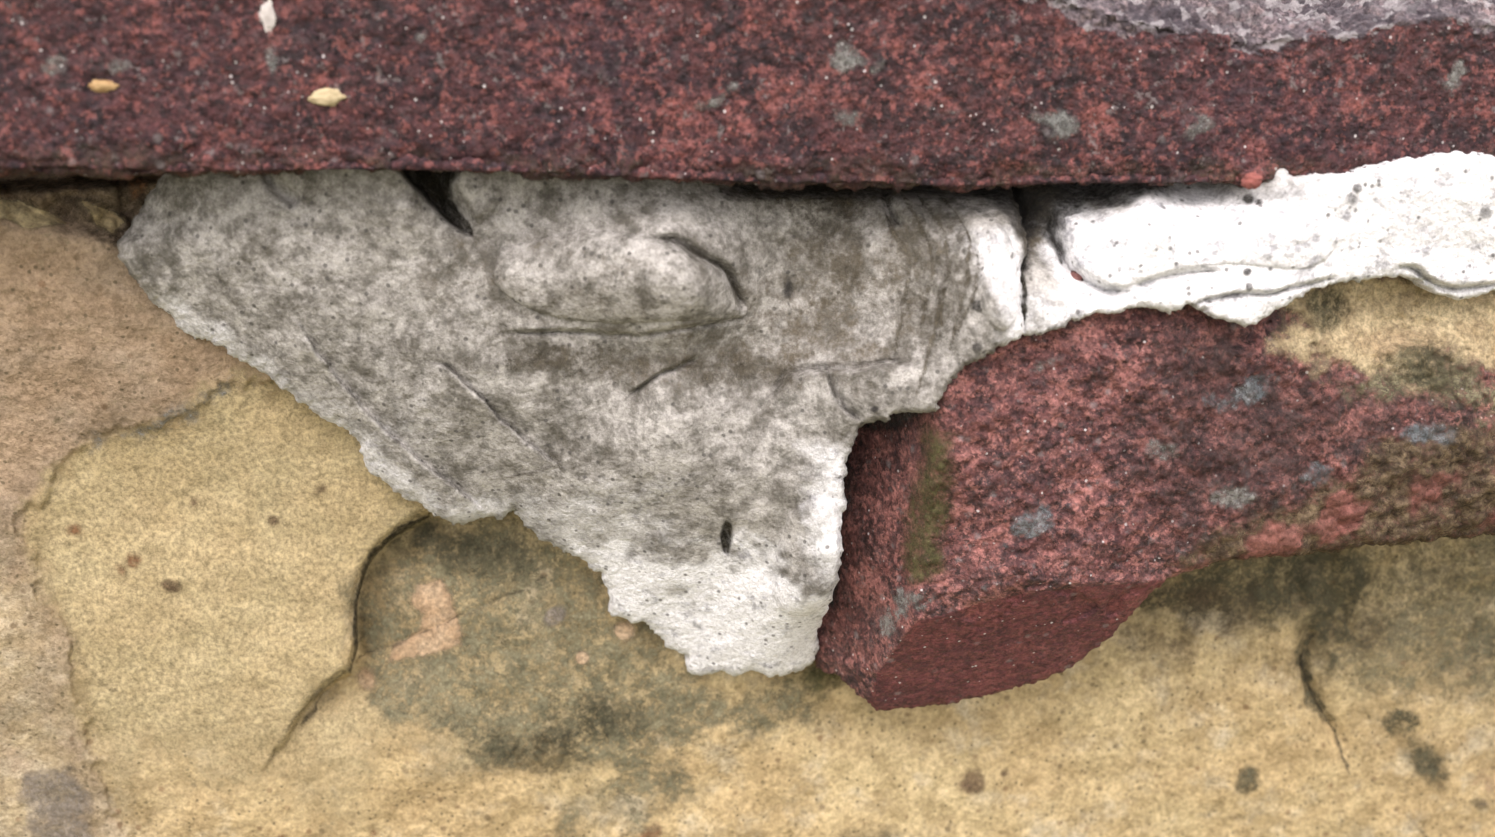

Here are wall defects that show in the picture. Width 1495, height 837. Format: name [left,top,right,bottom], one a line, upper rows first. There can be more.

leakage [391,524,532,575]
crack [303,517,543,722]
leakage [1130,552,1369,670]
crack [1295,551,1349,771]
leakage [491,696,639,772]
leakage [1410,742,1448,781]